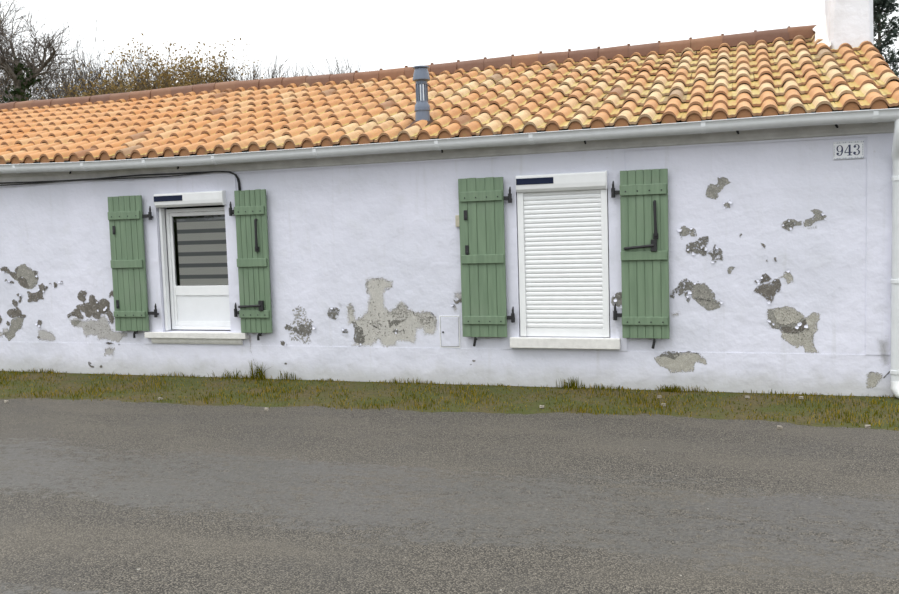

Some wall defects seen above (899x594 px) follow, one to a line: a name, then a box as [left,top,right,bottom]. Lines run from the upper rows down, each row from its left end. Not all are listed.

peeling [706,176,732,209]
peeling [782,209,826,231]
peeling [677,226,735,274]
peeling [0,264,62,341]
peeling [67,290,127,368]
peeling [280,306,315,346]
peeling [327,278,436,347]
peeling [670,279,723,310]
peeling [754,269,820,353]
spalling [654,351,707,372]